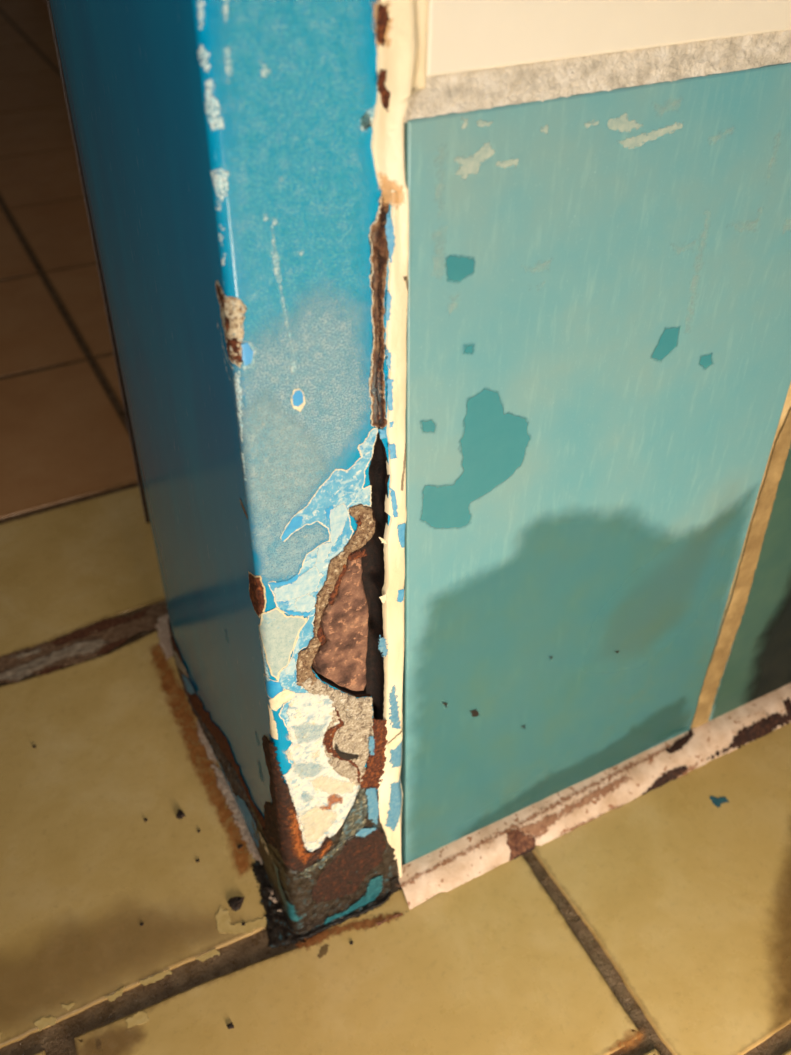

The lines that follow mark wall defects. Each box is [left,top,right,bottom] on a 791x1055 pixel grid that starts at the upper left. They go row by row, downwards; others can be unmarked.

peeling [197,0,205,29]
peeling [197,45,224,130]
peeling [210,168,229,210]
rust [215,280,256,381]
water stain [421,389,530,529]
peeling [234,371,387,765]
rust [328,549,367,605]
water stain [401,411,791,887]
rust [152,617,403,948]
peeling [388,730,403,750]